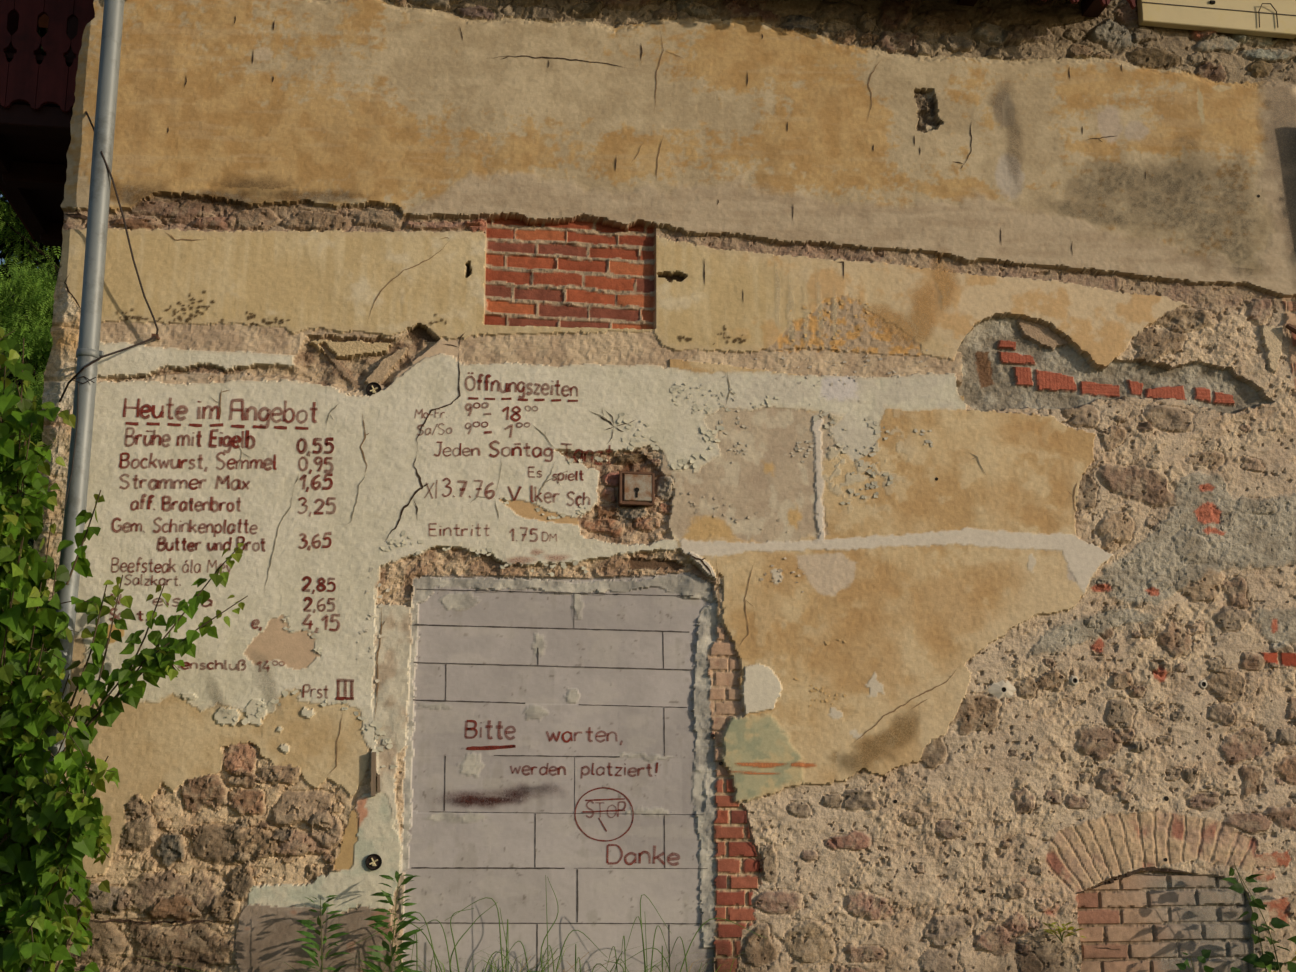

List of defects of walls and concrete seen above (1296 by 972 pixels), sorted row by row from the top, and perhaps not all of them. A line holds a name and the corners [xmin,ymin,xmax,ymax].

spalling [108,196,487,235]
crack [368,237,448,319]
spalling [55,699,408,972]
spalling [357,376,789,660]
crack [852,665,961,744]
spalling [654,227,1296,972]